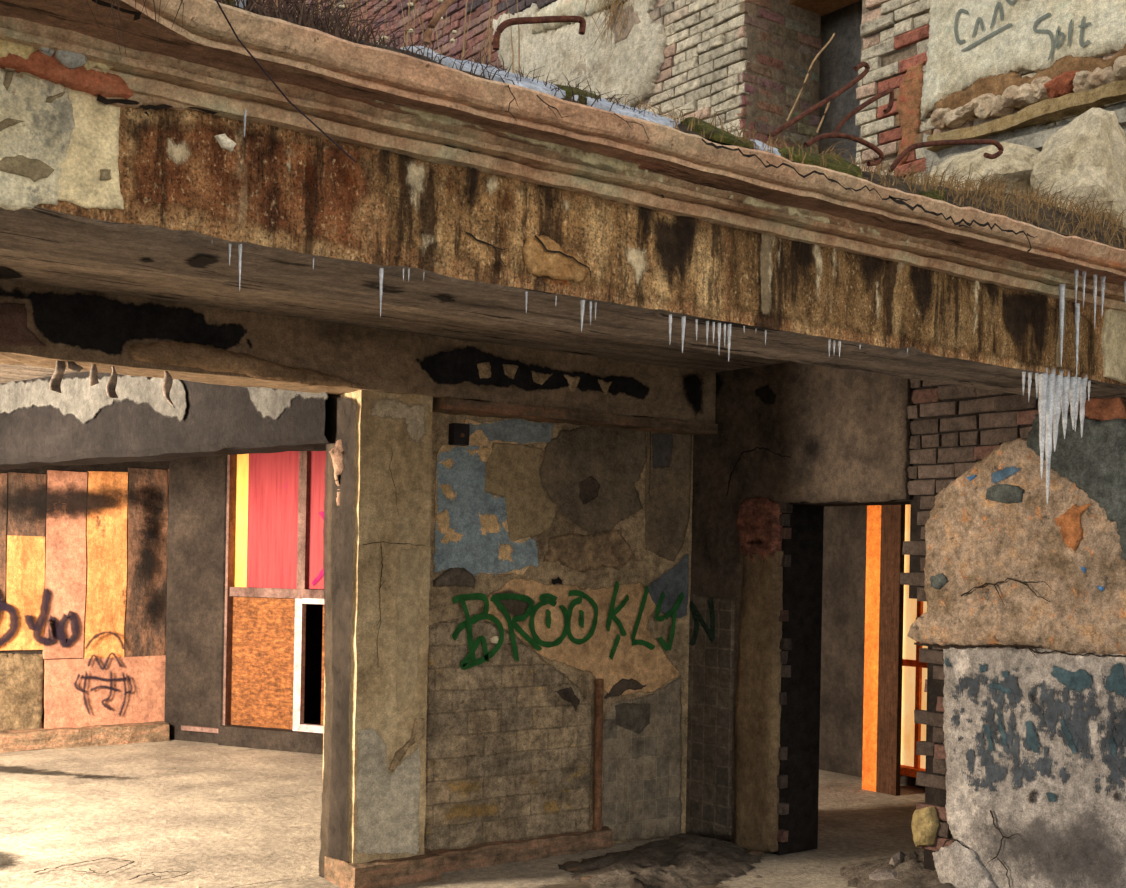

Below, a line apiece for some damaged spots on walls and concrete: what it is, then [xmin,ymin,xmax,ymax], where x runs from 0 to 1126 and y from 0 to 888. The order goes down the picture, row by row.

spalling [0,155,54,182]
leakage [501,131,647,176]
rust [128,123,1098,376]
leakage [760,233,771,314]
leakage [730,195,830,223]
crack [702,138,1037,252]
peeling [0,287,367,424]
peeling [416,346,650,400]
peeling [433,418,689,734]
peeling [946,663,1126,802]
leakage [0,852,15,867]
leakage [978,813,1125,888]